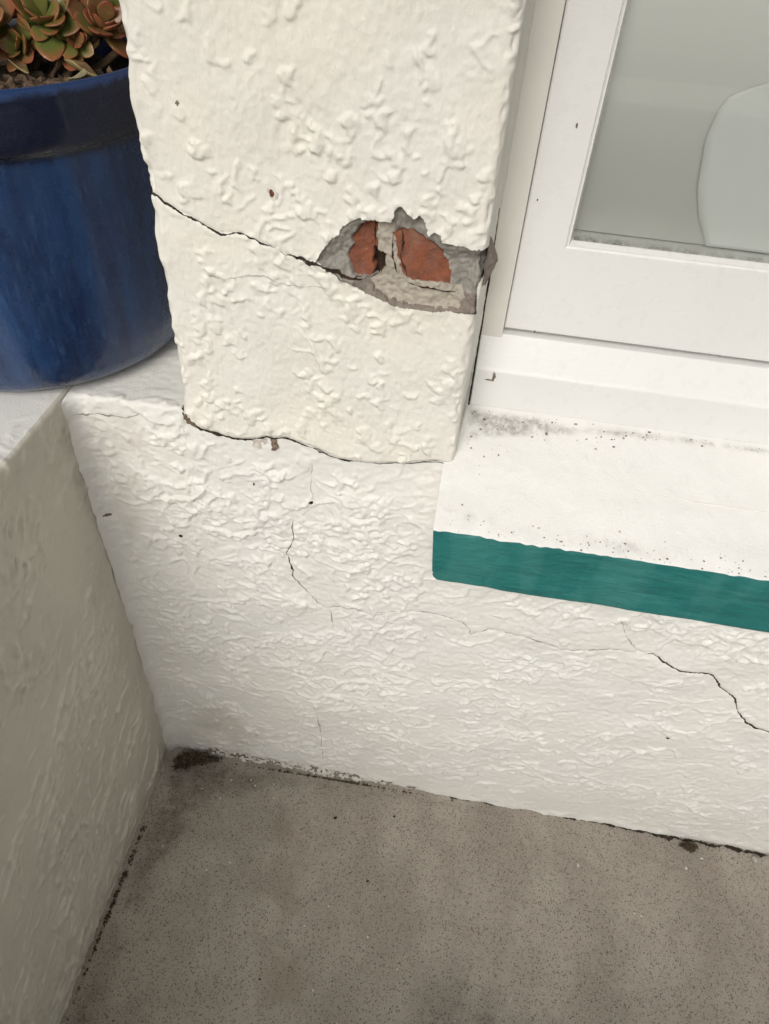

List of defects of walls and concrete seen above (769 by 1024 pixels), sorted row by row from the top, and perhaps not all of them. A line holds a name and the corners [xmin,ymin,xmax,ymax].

crack [152,192,343,289]
spalling [316,207,498,315]
crack [182,405,769,732]